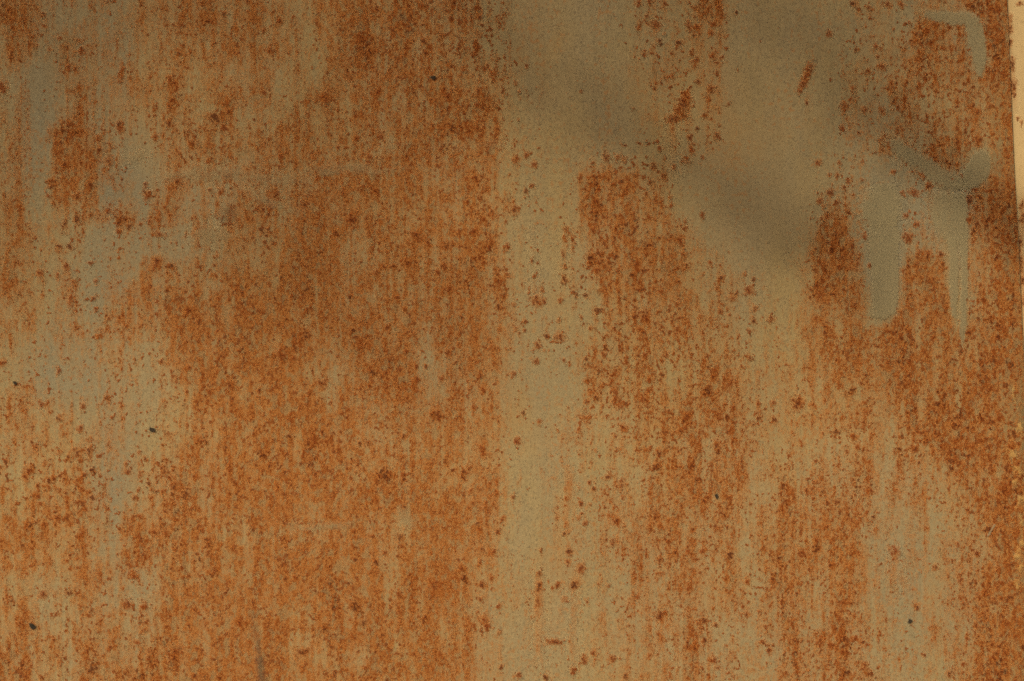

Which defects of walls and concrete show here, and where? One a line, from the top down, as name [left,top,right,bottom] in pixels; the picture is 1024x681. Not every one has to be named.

corrosion [0,0,555,681]
corrosion [516,523,587,621]
corrosion [527,0,1024,681]